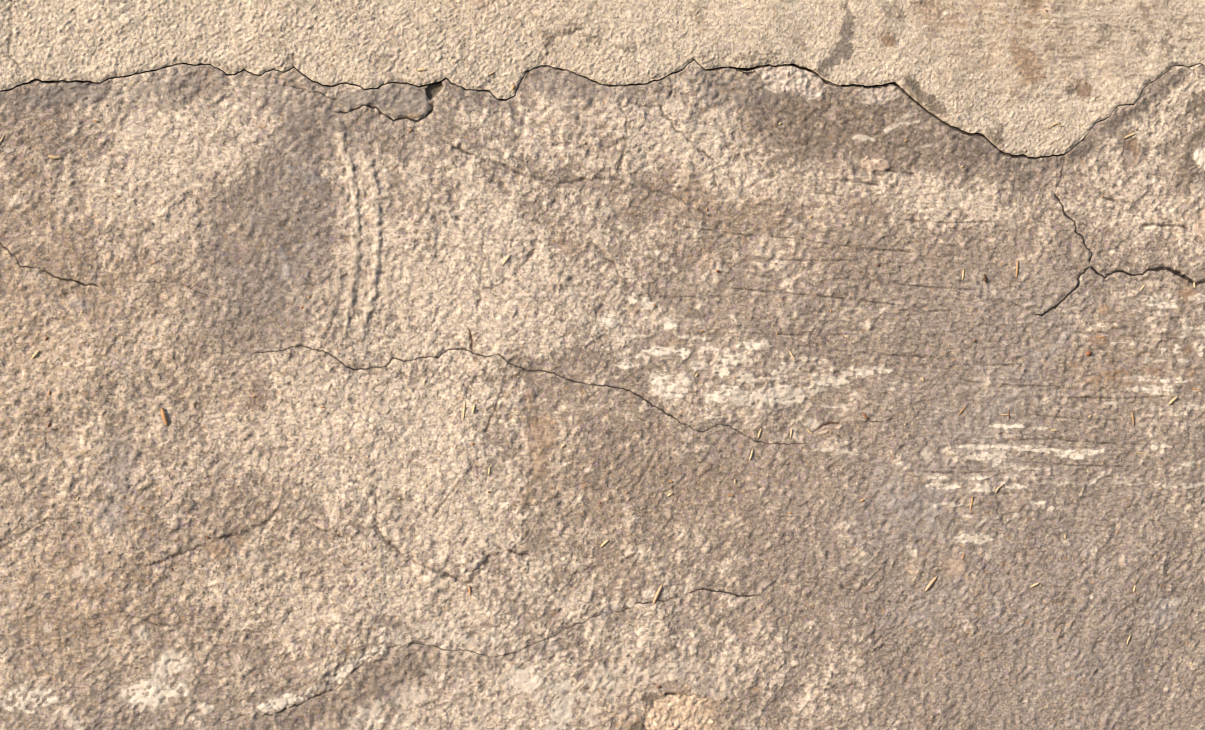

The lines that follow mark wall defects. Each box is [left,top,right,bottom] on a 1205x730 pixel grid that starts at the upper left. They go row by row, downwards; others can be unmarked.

flaking render [338,84,429,117]
spalling [754,65,826,101]
spalling [858,86,900,104]
crack [0,60,1205,316]
crack [258,328,726,432]
crack [756,422,838,445]
flaking render [806,419,842,435]
flaking render [600,584,689,614]
flaking render [257,623,506,712]
spalling [630,692,715,730]